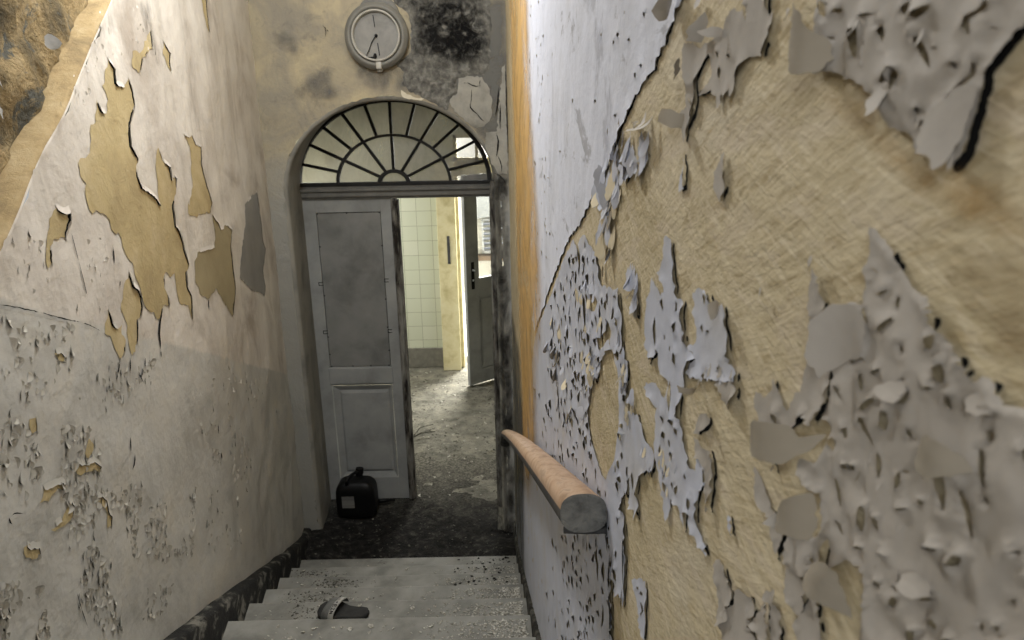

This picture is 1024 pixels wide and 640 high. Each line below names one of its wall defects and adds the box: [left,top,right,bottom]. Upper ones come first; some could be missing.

peeling [28,204,72,280]
peeling [0,316,197,640]
peeling [71,0,266,412]
flaking render [394,0,508,174]
damp [411,0,505,137]
peeling [516,0,1024,640]